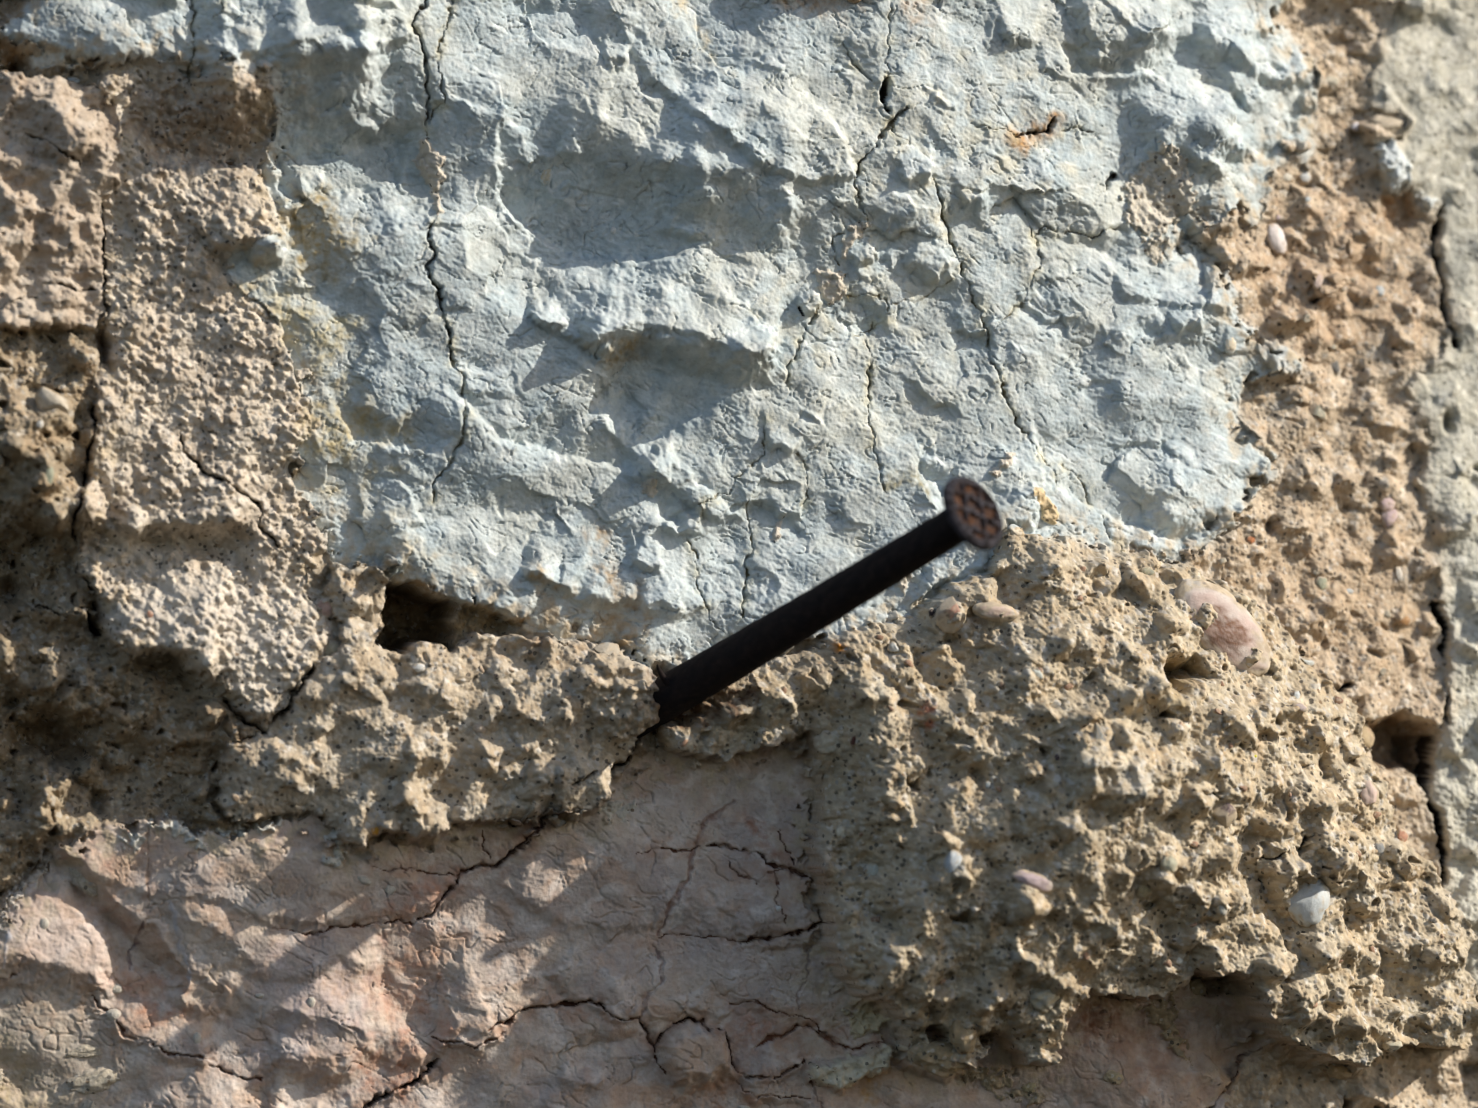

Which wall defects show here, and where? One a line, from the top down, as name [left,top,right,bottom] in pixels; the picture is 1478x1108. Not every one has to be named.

crack [411,0,455,137]
crack [786,0,1126,553]
crack [1429,205,1461,349]
crack [425,220,469,504]
crack [686,417,810,633]
rust [641,660,767,738]
crack [1429,601,1452,657]
peeling [119,832,147,855]
peeling [215,816,284,841]
crack [268,737,641,936]
crack [1413,692,1452,886]
crack [363,999,886,1108]